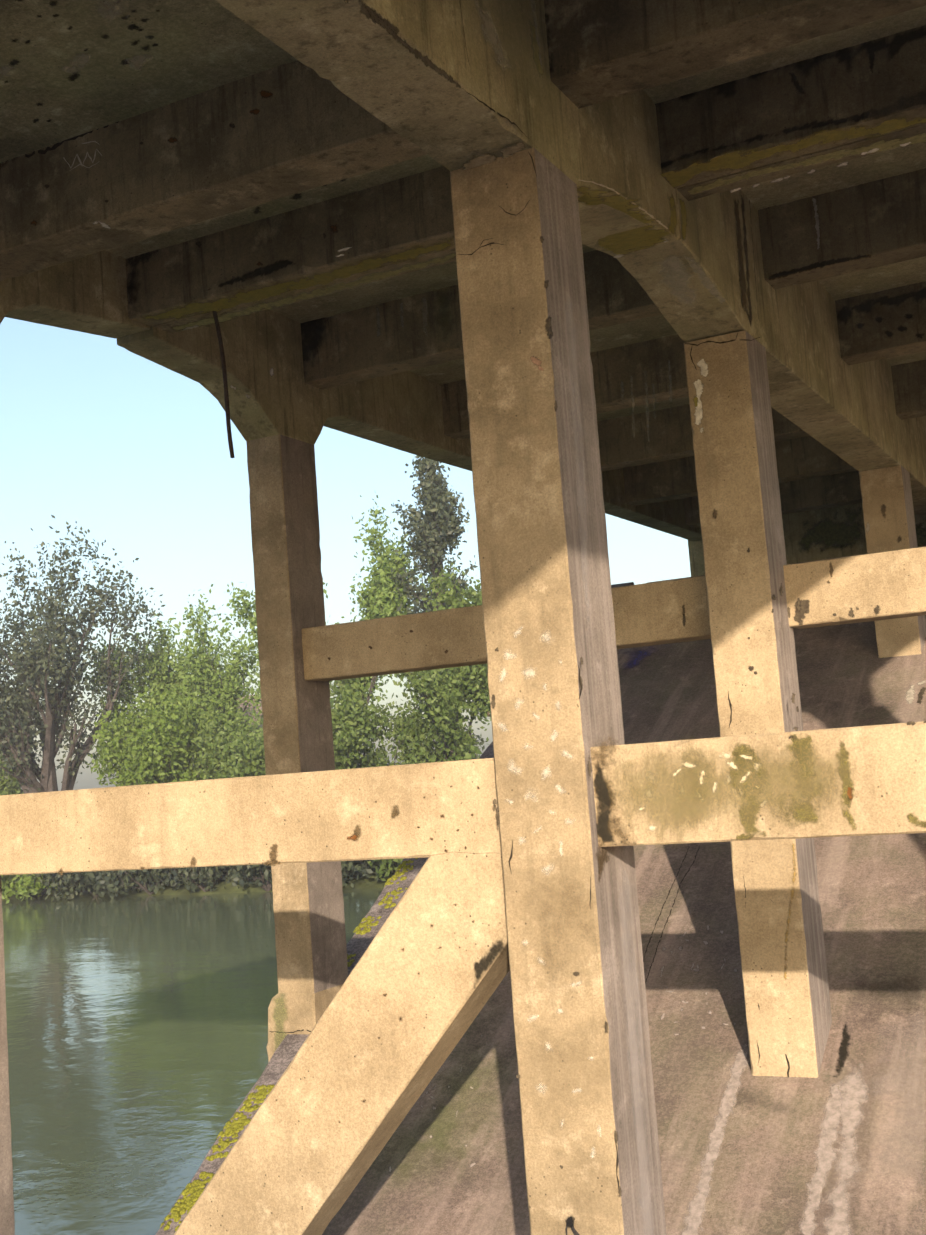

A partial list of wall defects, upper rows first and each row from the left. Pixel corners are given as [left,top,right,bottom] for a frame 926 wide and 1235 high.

crack [459,238,504,255]
damp [837,742,856,829]
damp [682,1050,748,1235]
damp [800,1024,867,1235]